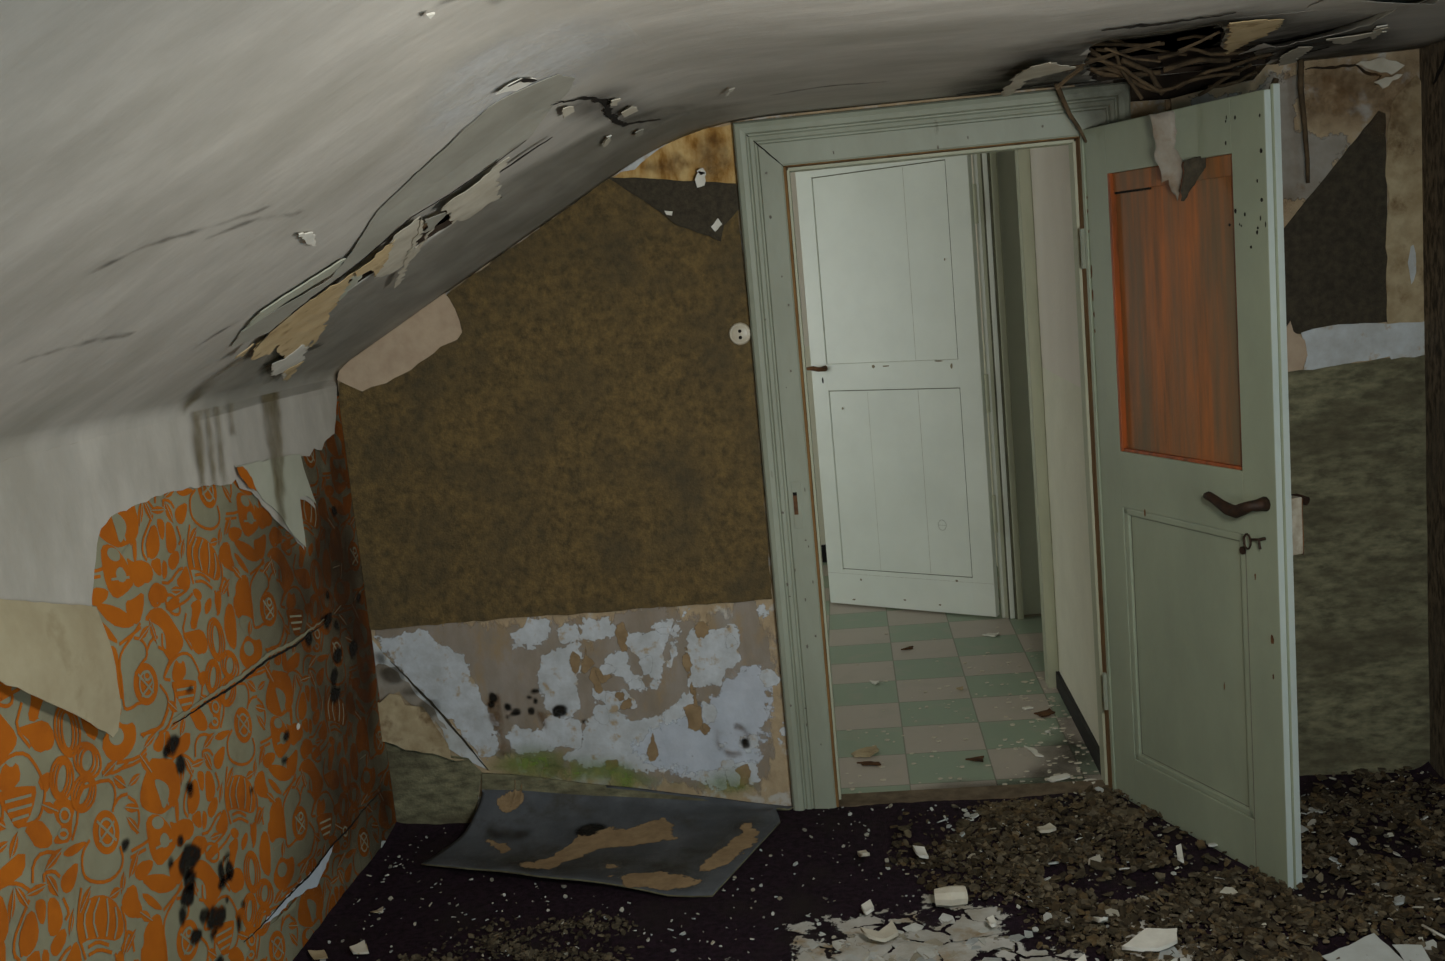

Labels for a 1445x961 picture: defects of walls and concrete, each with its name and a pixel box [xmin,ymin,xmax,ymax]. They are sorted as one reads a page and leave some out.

crack [500,96,661,172]
peeling [1188,25,1425,372]
peeling [235,157,510,391]
damp [187,397,222,481]
damp [264,392,283,499]
peeling [0,599,121,738]
damp [164,735,193,796]
damp [276,485,368,858]
peeling [372,600,786,825]
damp [169,836,245,944]